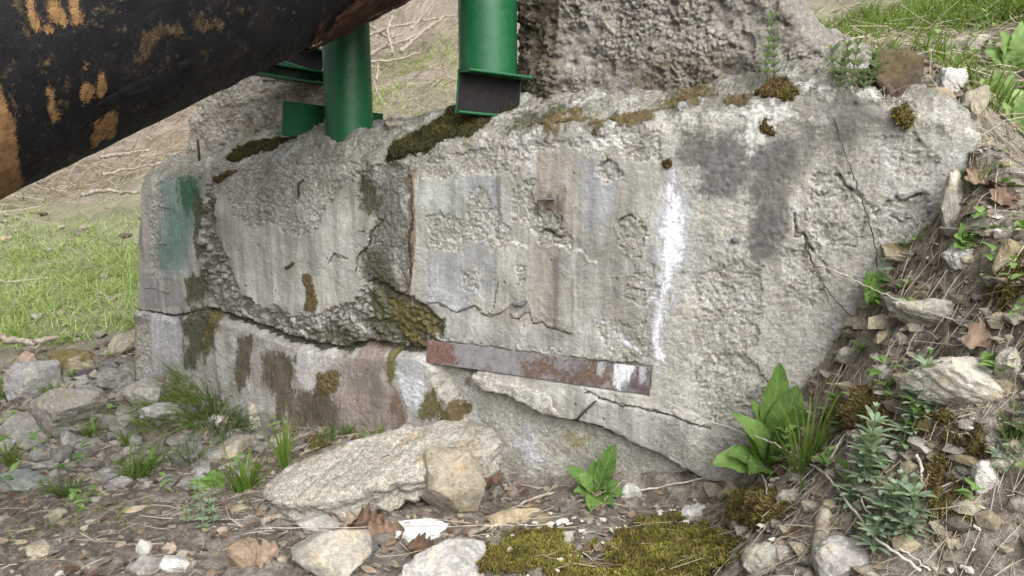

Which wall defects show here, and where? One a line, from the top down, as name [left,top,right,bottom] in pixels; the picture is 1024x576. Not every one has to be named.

water stain [650,71,895,371]
spalling [200,160,642,365]
rust [427,340,459,366]
rust [520,354,615,390]
rust [628,366,651,395]
crack [585,389,711,429]